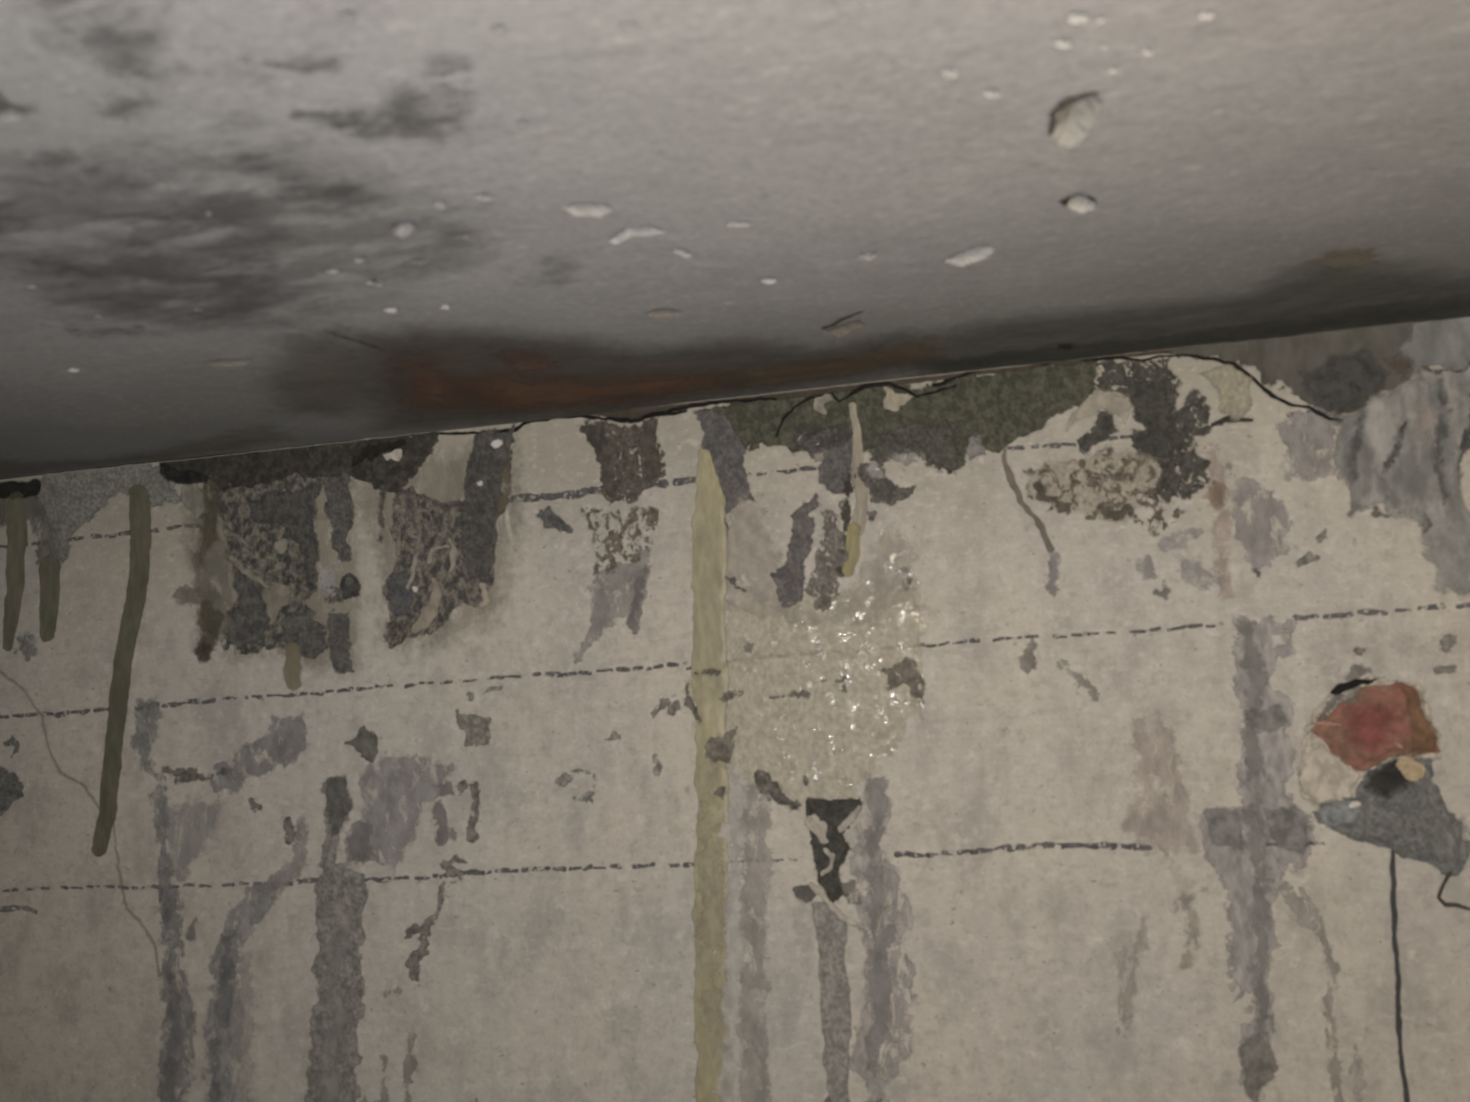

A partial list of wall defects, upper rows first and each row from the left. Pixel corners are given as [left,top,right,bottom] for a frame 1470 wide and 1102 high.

spalling [1049,92,1102,150]
water stain [38,197,283,317]
rust [289,332,935,424]
crack [409,370,982,438]
crack [1032,354,1342,426]
water stain [3,492,61,651]
spalling [159,424,515,690]
spalling [575,417,666,663]
water stain [91,485,480,1102]
water stain [650,402,926,1102]
spalling [1297,664,1442,808]